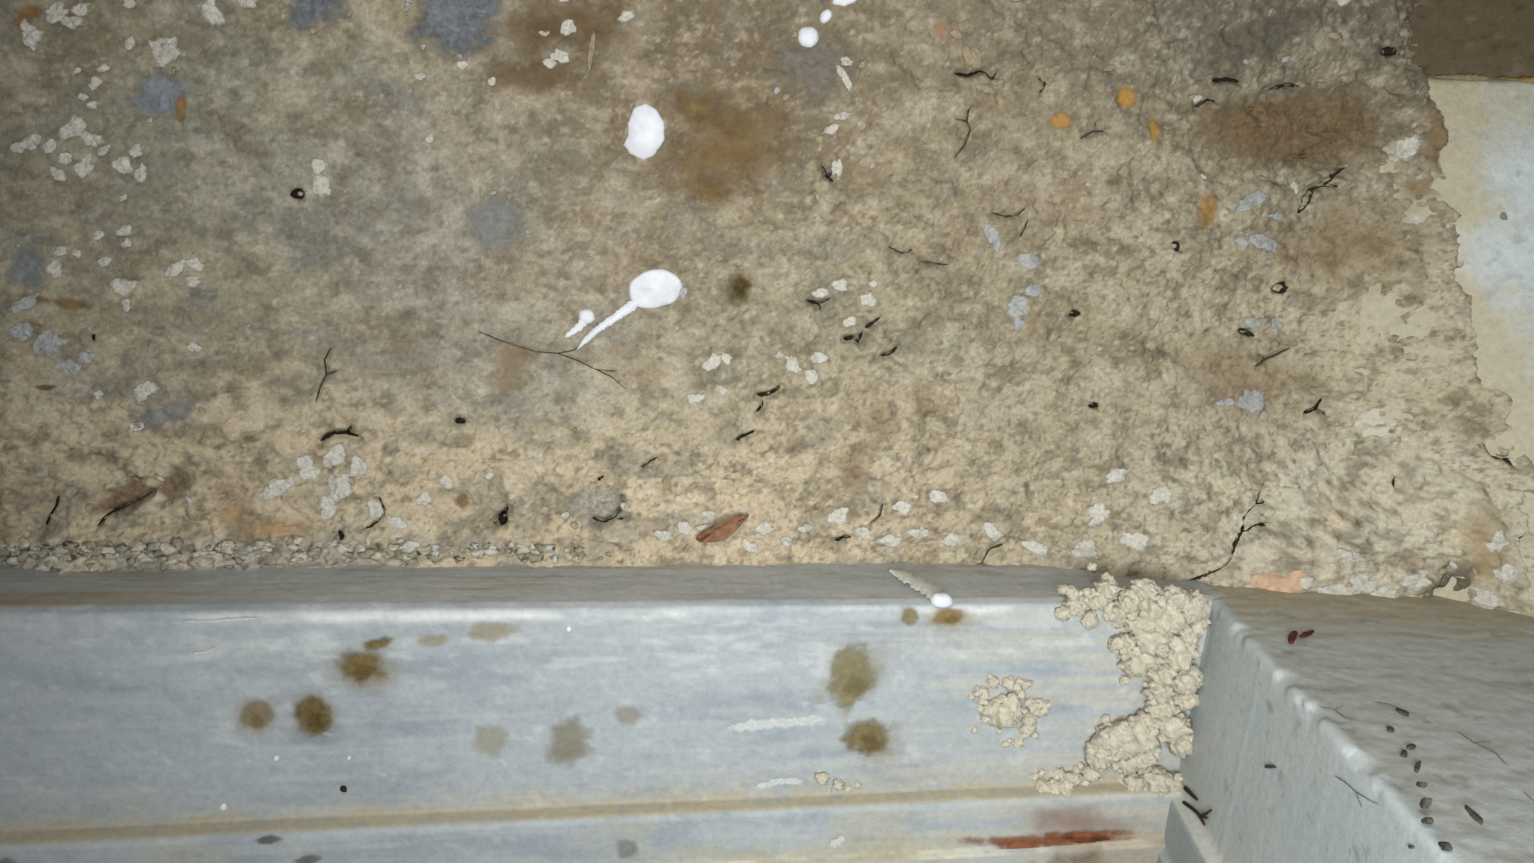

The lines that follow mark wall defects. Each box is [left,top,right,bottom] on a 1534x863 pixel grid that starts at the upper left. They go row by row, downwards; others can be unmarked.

damp [342,638,389,680]
damp [830,648,873,707]
damp [243,703,269,727]
damp [297,698,330,733]
damp [843,720,886,754]
rust [969,831,1119,849]